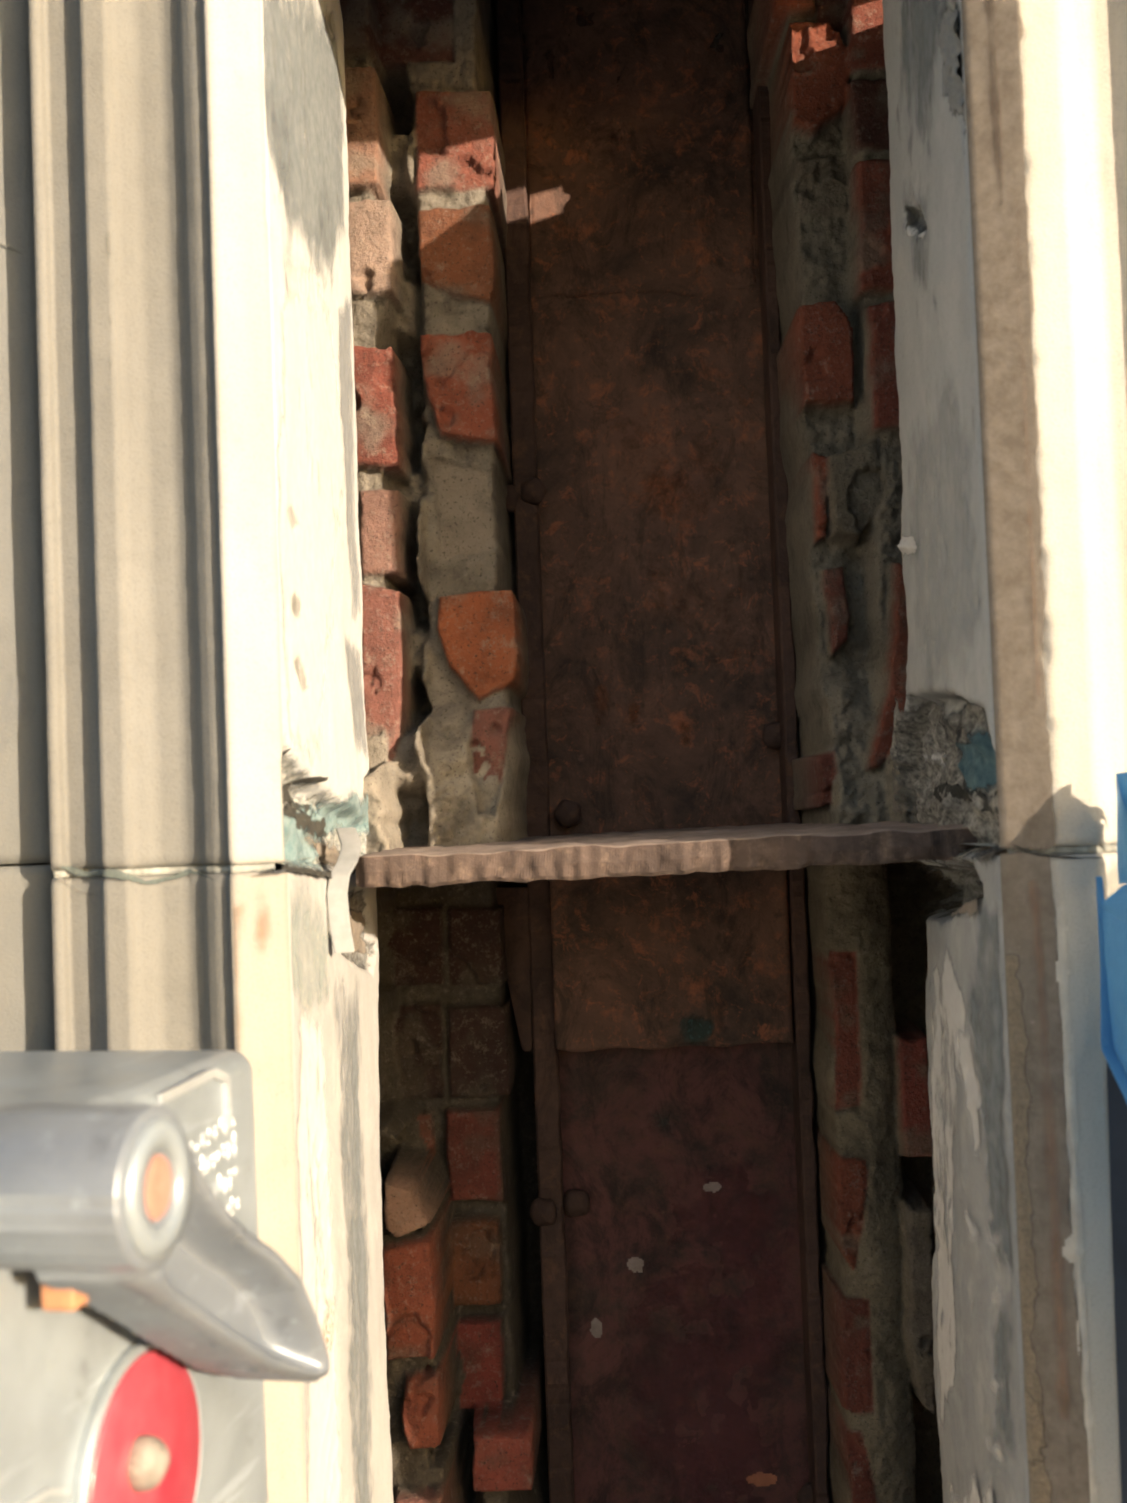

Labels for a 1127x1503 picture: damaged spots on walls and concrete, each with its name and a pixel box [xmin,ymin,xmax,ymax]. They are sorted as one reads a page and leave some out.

damp [263,0,344,272]
spalling [279,756,369,871]
spalling [890,695,1007,917]